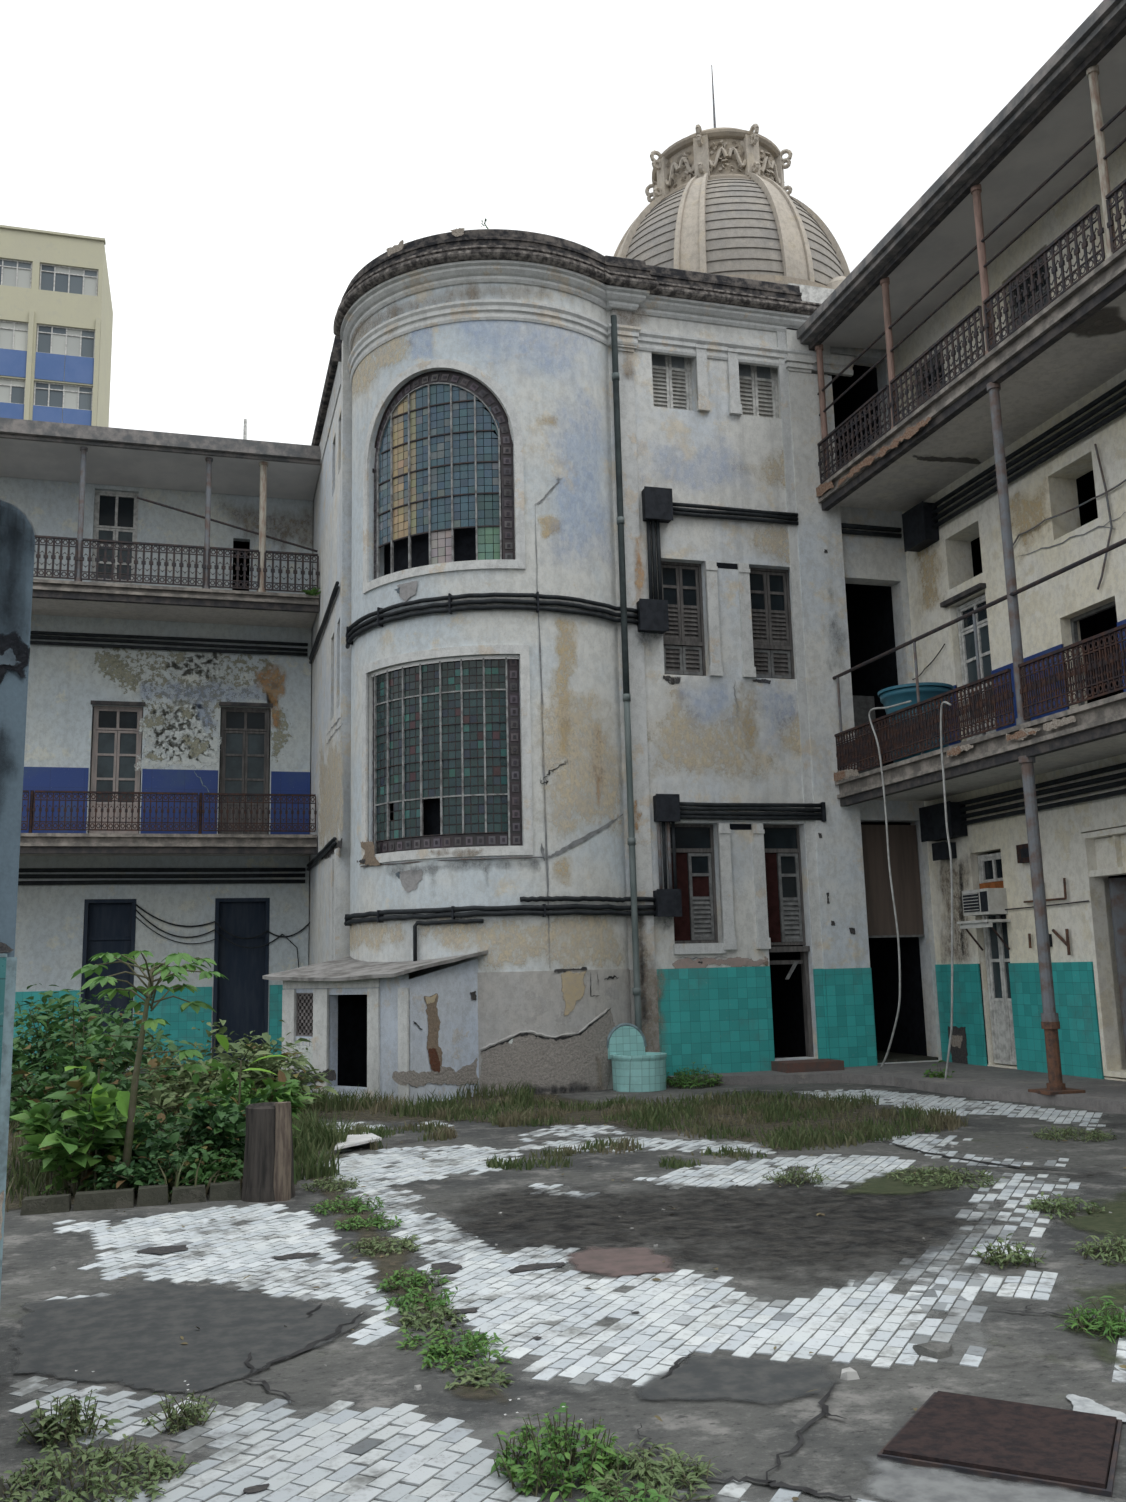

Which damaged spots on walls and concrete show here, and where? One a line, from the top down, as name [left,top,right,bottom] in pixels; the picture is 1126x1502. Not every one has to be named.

leakage [0,591,30,684]
peeling [92,647,292,771]
leakage [543,620,620,833]
peeling [424,993,443,1072]
flaking render [480,967,615,1095]
crack [698,1384,862,1501]